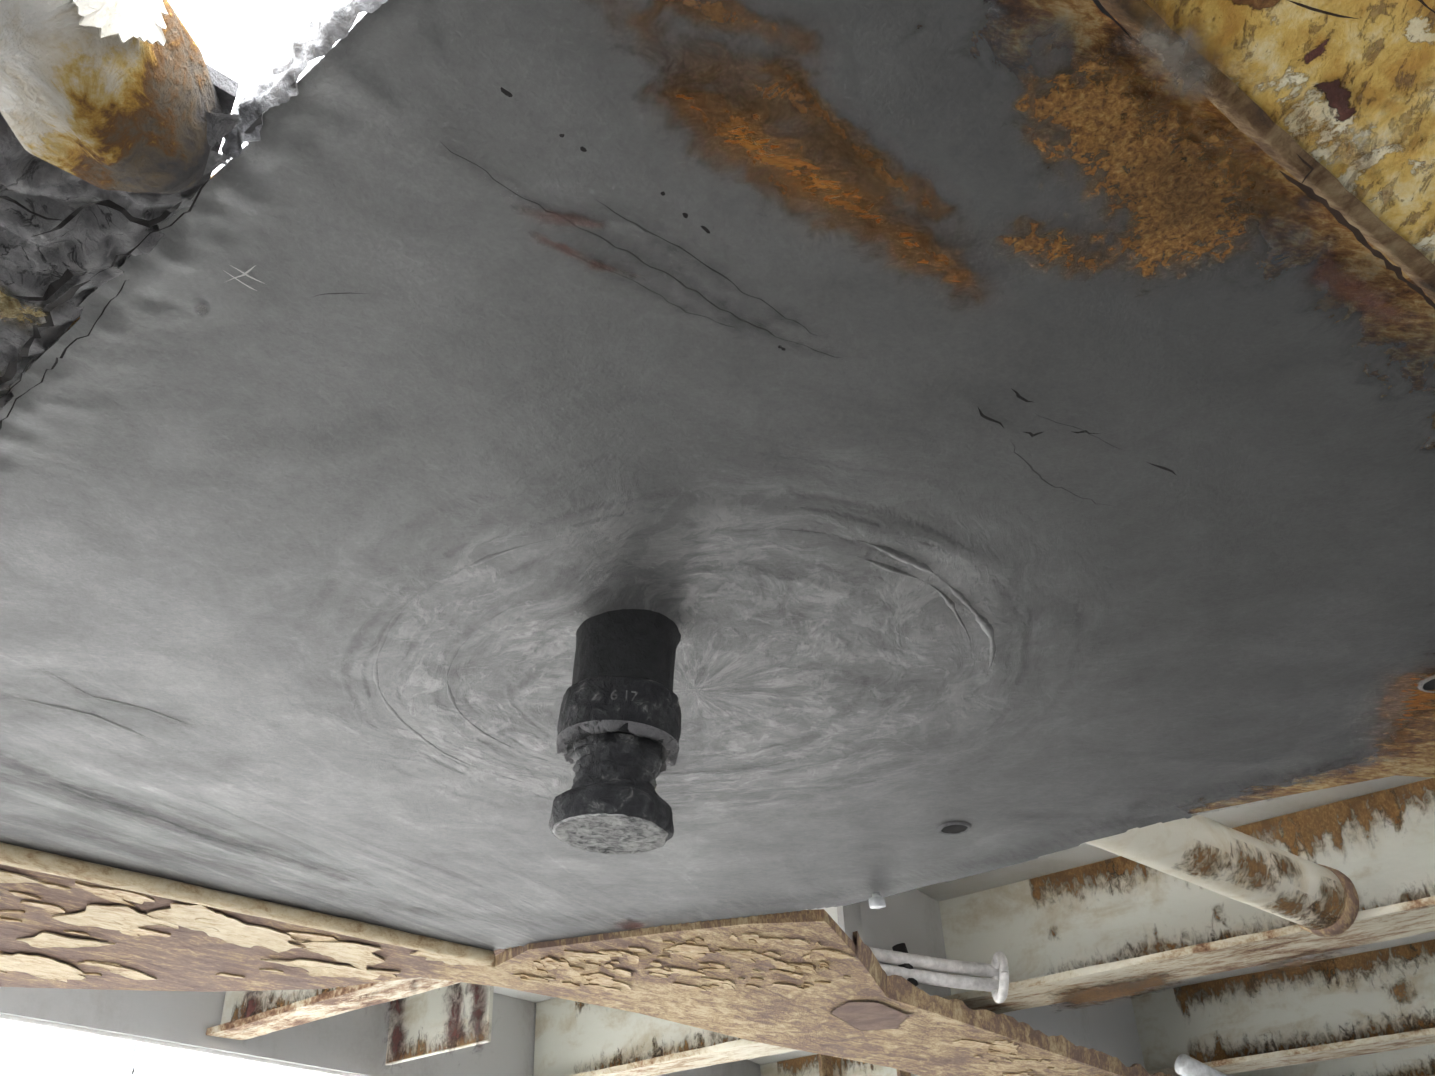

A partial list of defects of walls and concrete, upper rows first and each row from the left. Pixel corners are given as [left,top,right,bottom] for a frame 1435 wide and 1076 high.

peeling [73,0,169,46]
crack [1092,0,1132,39]
peeling [1232,0,1281,10]
crack [1288,0,1358,19]
corrosion [998,48,1269,279]
crack [1279,154,1435,309]
crack [0,179,210,429]
peeling [0,870,401,982]
peeling [513,933,855,991]
corrosion [1029,856,1150,904]
corrosion [1050,939,1435,1063]
corrosion [1052,778,1435,974]